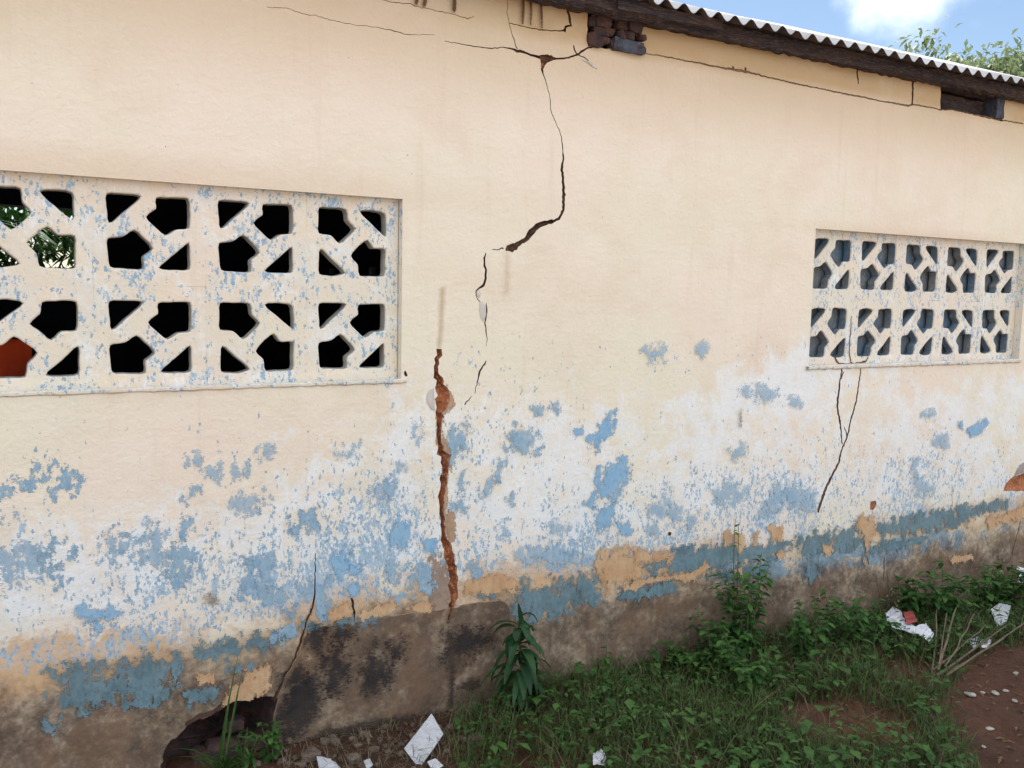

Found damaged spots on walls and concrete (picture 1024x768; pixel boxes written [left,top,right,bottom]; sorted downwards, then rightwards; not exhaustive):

crack [645,53,1023,124]
crack [269,0,597,623]
peeling [0,530,79,595]
peeling [0,447,85,526]
peeling [97,442,278,592]
peeling [40,514,439,768]
crack [272,553,316,700]
leakage [275,619,427,745]
leakage [437,623,499,708]
peeling [446,400,562,515]
peeling [464,407,1024,627]
crack [817,316,868,513]